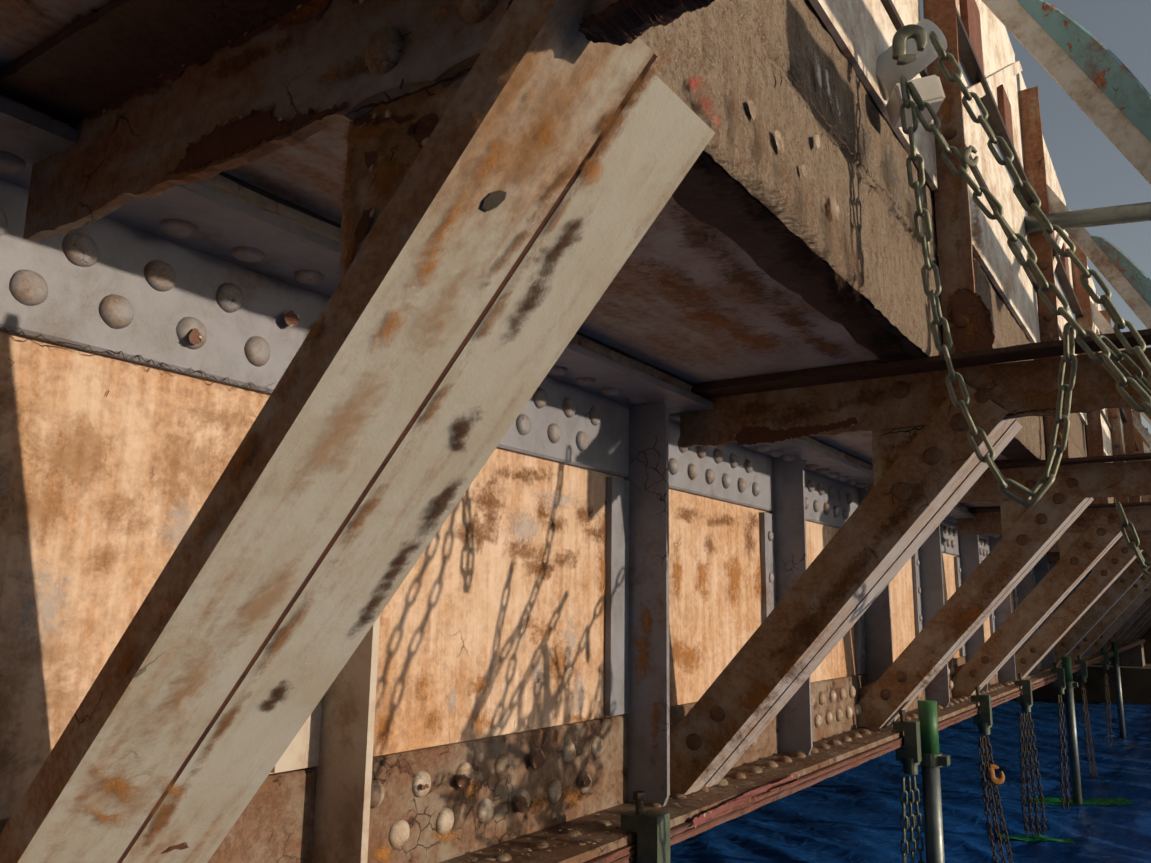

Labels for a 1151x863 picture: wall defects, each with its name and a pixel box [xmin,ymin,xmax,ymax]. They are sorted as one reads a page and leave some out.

corrosion [578,0,715,46]
peeling [165,102,439,175]
corrosion [475,52,665,337]
corrosion [947,288,995,354]
corrosion [453,412,479,450]
corrosion [353,545,418,629]
corrosion [424,483,461,534]
corrosion [457,469,551,551]
corrosion [511,540,576,579]
corrosion [538,503,567,531]
corrosion [681,509,733,595]
corrosion [693,676,775,773]